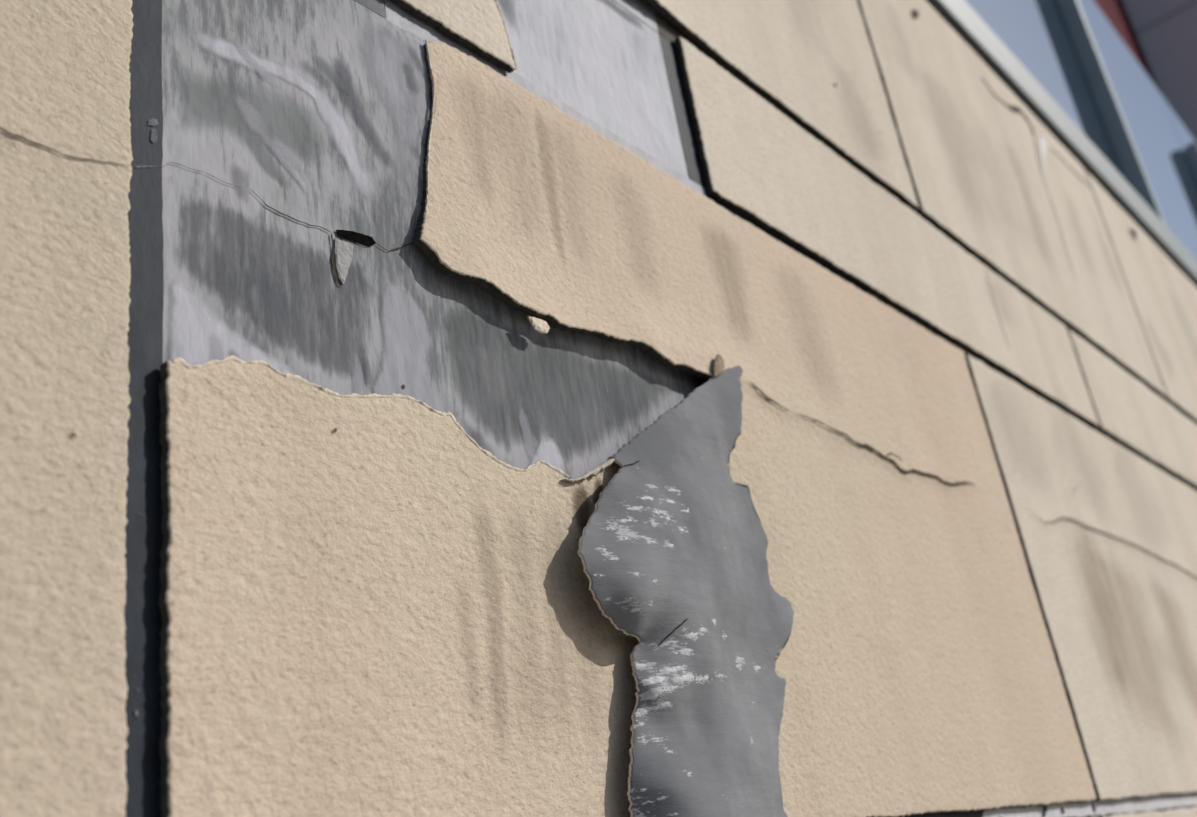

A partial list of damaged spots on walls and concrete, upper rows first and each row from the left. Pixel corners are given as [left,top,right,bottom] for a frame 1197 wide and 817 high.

crack [0,127,123,165]
peeling [137,0,794,817]
crack [750,382,976,486]